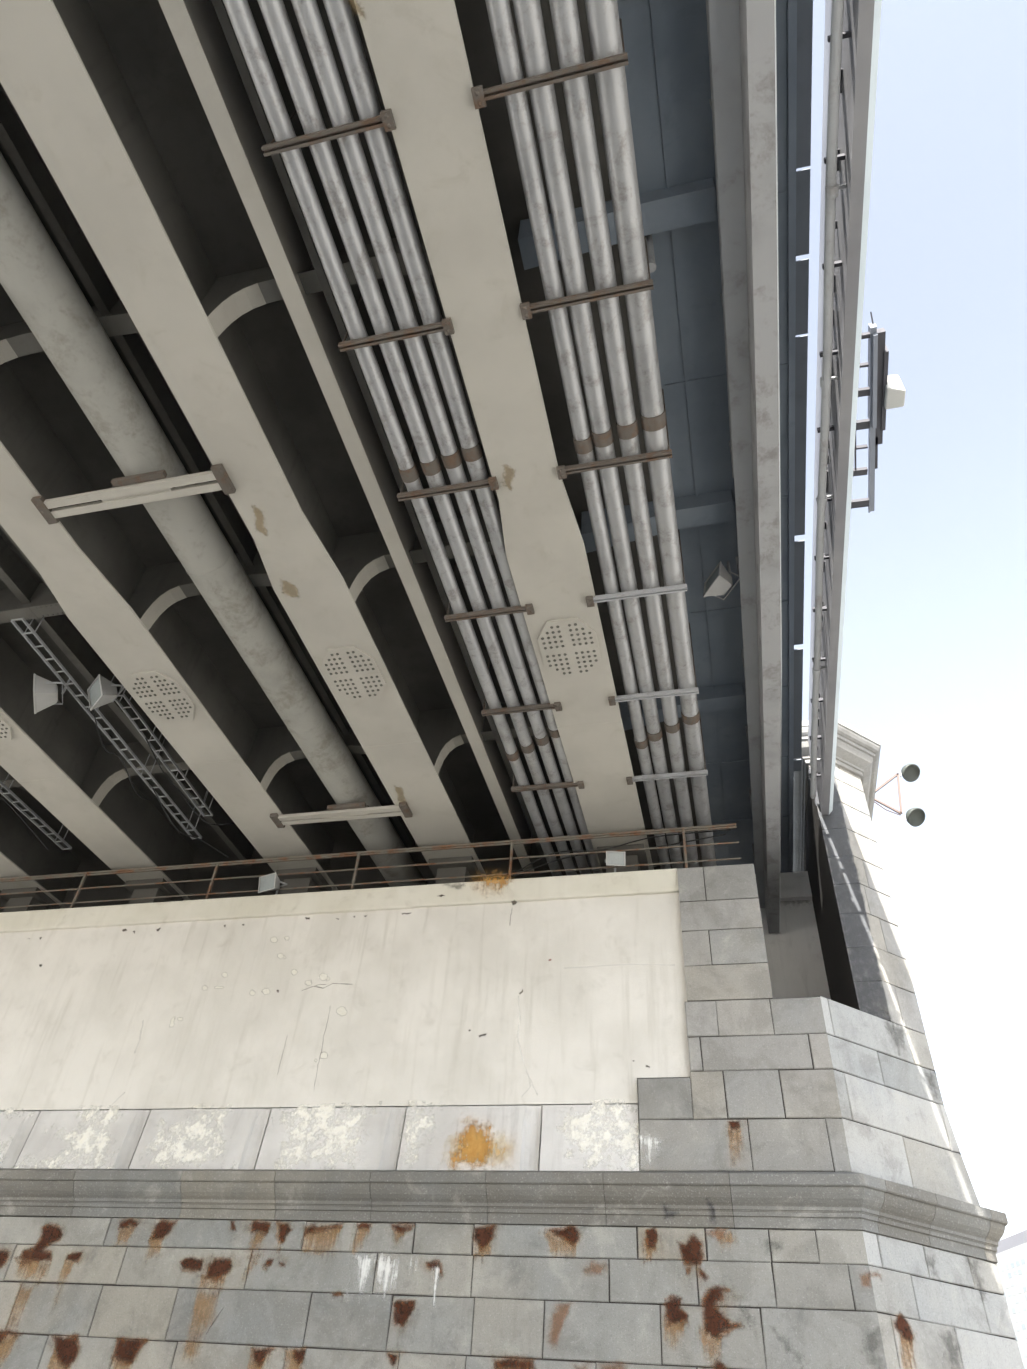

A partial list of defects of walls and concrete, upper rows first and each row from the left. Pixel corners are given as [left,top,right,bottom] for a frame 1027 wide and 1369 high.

rust [451,1123,505,1168]
rust [231,1221,371,1266]
rust [391,1224,413,1240]
rust [645,1228,658,1257]
rust [0,1224,81,1358]
rust [181,1258,232,1356]
rust [665,1230,741,1369]
rust [49,1335,79,1369]
rust [113,1338,148,1369]
rust [895,1314,913,1369]